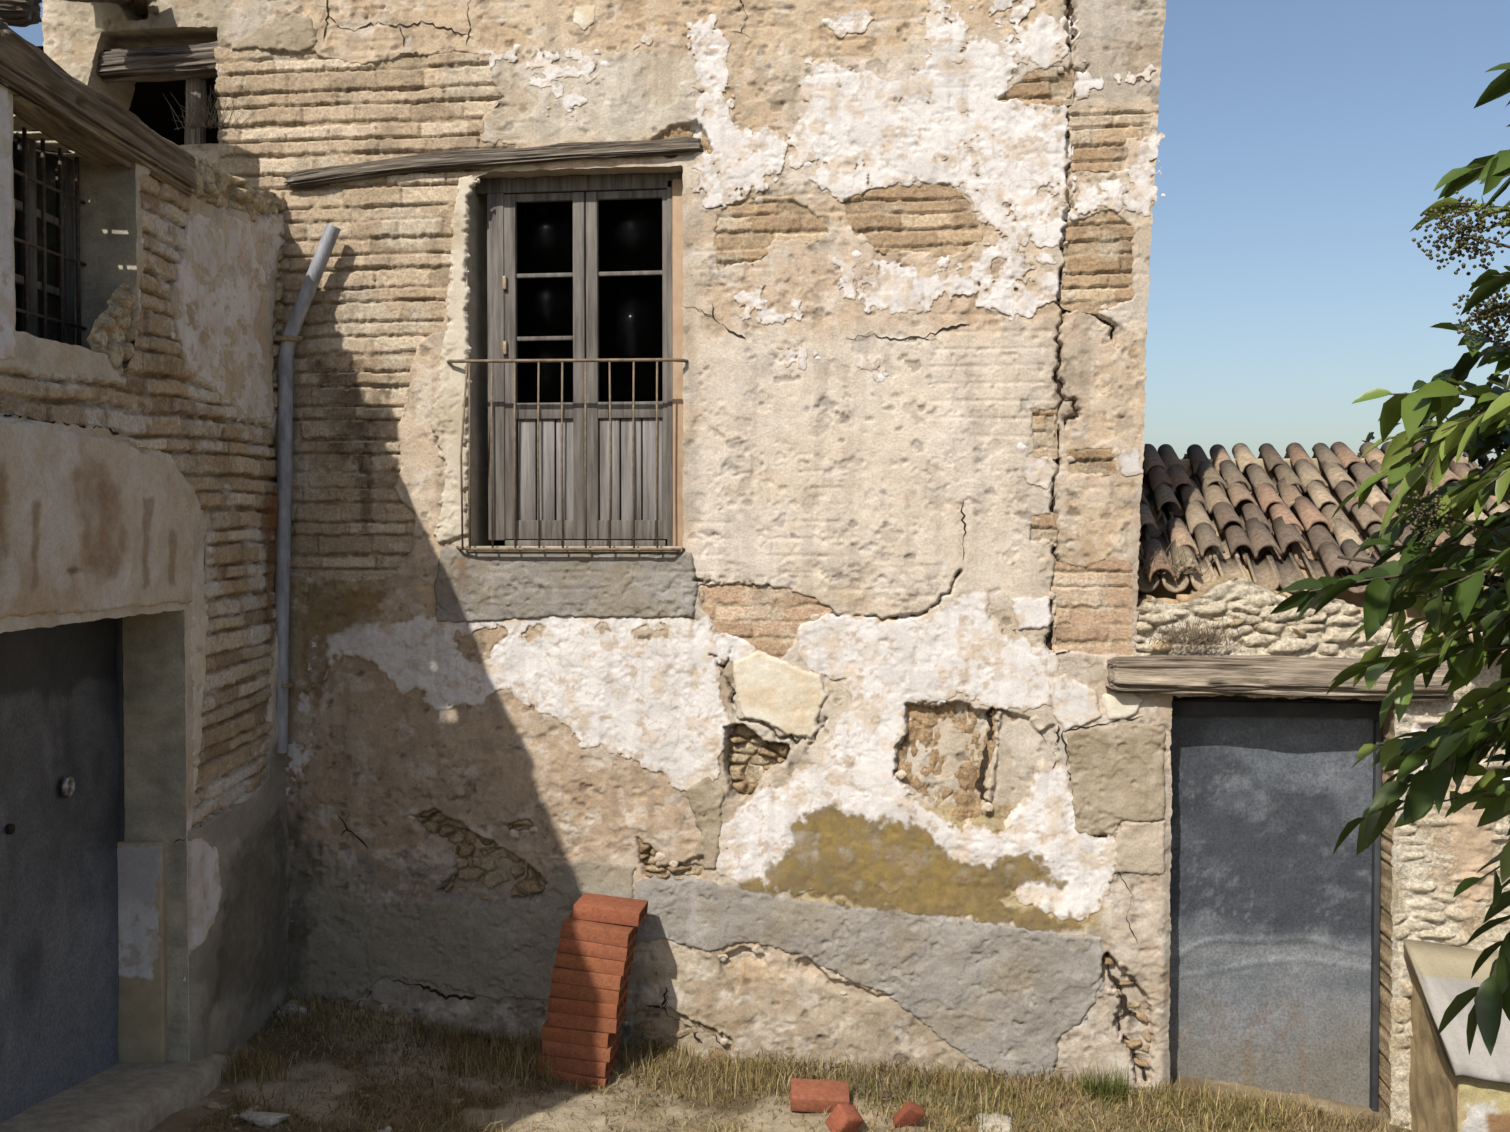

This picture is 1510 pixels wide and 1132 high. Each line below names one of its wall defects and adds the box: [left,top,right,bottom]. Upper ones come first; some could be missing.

peeling [573,5,596,30]
crack [1066,0,1075,57]
peeling [657,0,1165,320]
crack [1050,106,1114,562]
flaking render [0,44,1144,955]
crack [891,502,966,619]
crack [1011,599,1069,655]
crack [975,708,995,801]
crack [1040,716,1142,837]
peeling [117,844,162,981]
leakage [739,805,1081,931]
crack [1105,872,1147,1081]